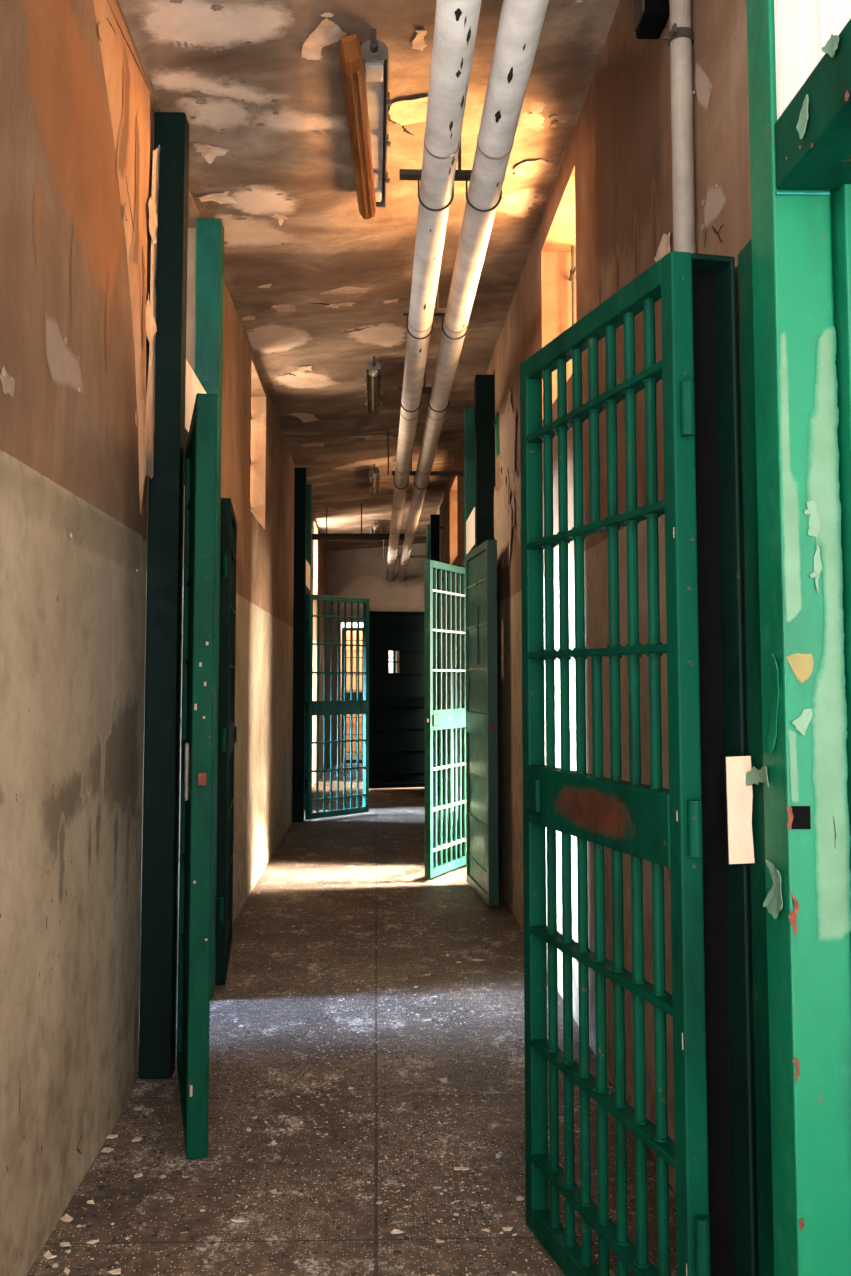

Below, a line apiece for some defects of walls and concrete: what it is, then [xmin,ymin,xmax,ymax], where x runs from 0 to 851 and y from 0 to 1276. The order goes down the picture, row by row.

peeling [135,0,300,54]
peeling [301,12,346,61]
peeling [821,34,839,57]
peeling [148,66,349,164]
peeling [796,94,808,139]
peeling [197,184,302,249]
peeling [0,366,15,397]
peeling [44,309,84,396]
peeling [242,304,317,355]
peeling [269,366,342,389]
peeling [745,326,851,943]